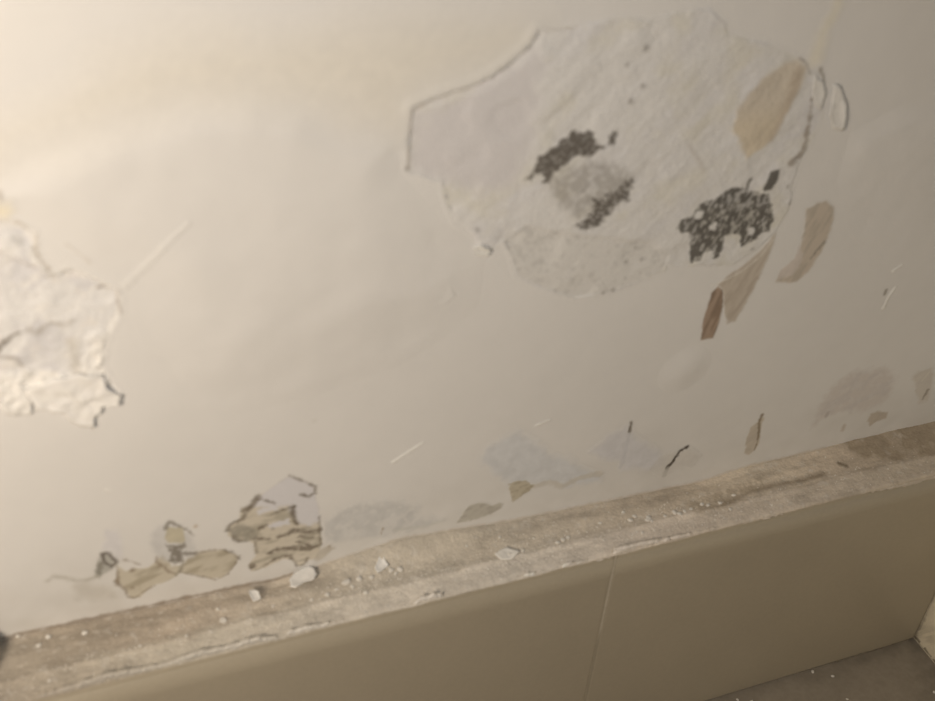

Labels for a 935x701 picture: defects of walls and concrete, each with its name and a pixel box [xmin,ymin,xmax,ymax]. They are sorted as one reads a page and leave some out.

spalling [400,3,847,342]
spalling [0,213,126,429]
peeling [112,547,242,600]
peeling [249,589,261,602]
peeling [289,566,317,588]